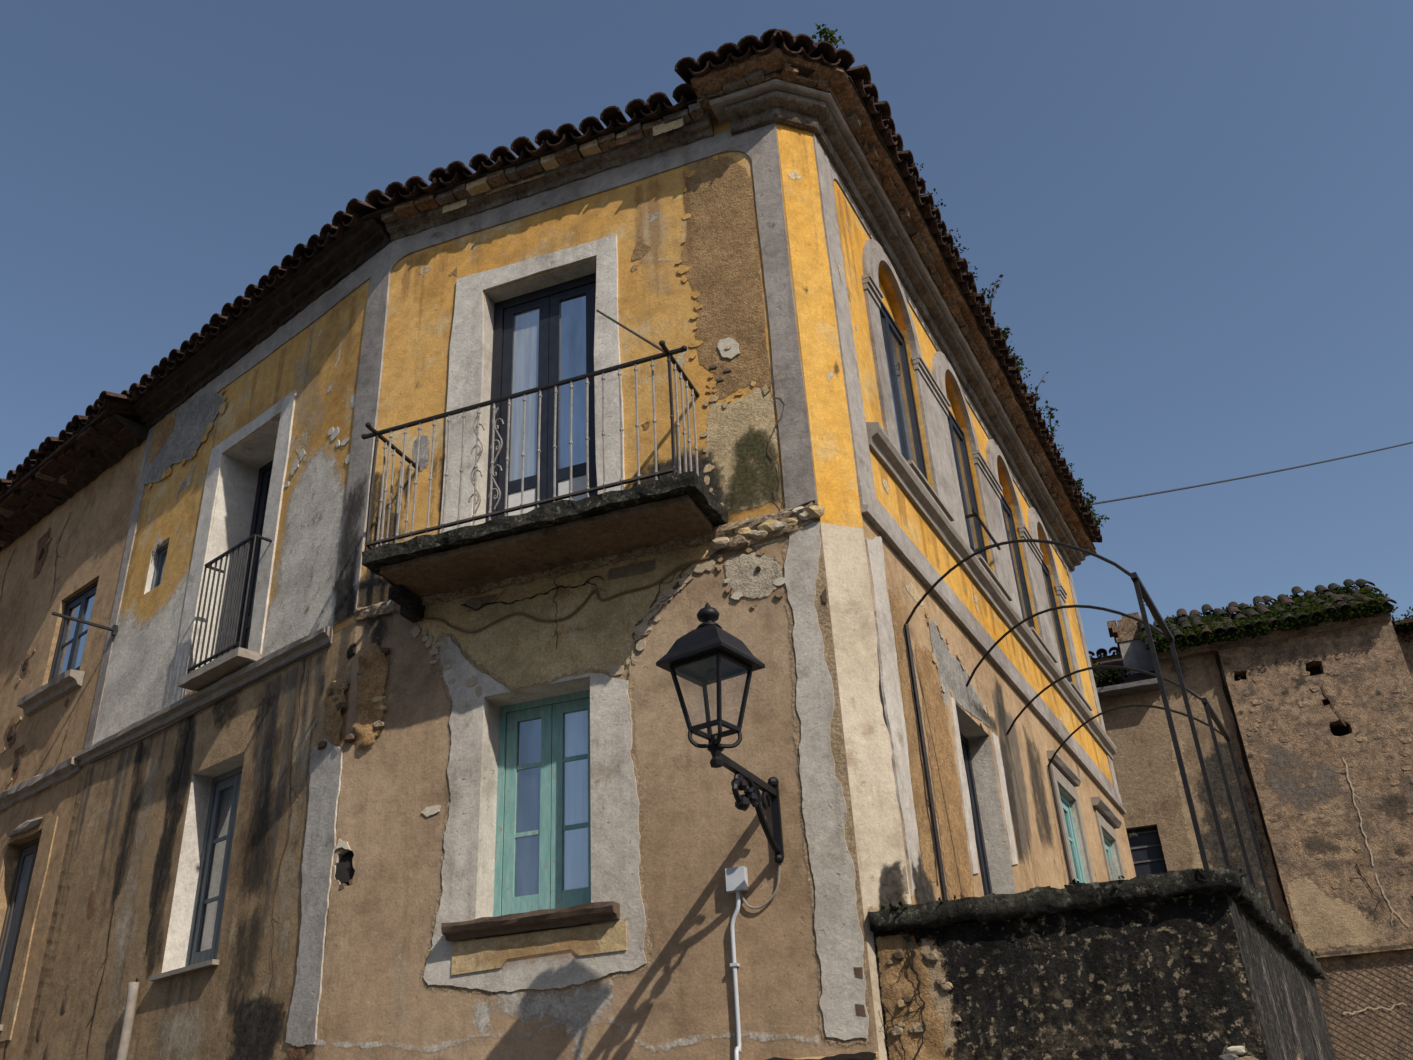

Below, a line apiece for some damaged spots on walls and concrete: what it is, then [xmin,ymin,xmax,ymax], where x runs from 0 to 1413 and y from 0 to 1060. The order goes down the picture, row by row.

flaking render [409,155,825,698]
peeling [262,427,350,658]
flaking render [347,643,356,660]
crack [461,576,604,650]
crack [627,564,696,679]
water stain [68,715,195,976]
water stain [227,656,321,1060]
flaking render [335,839,351,850]
water stain [974,680,1052,860]
water stain [1197,742,1271,909]